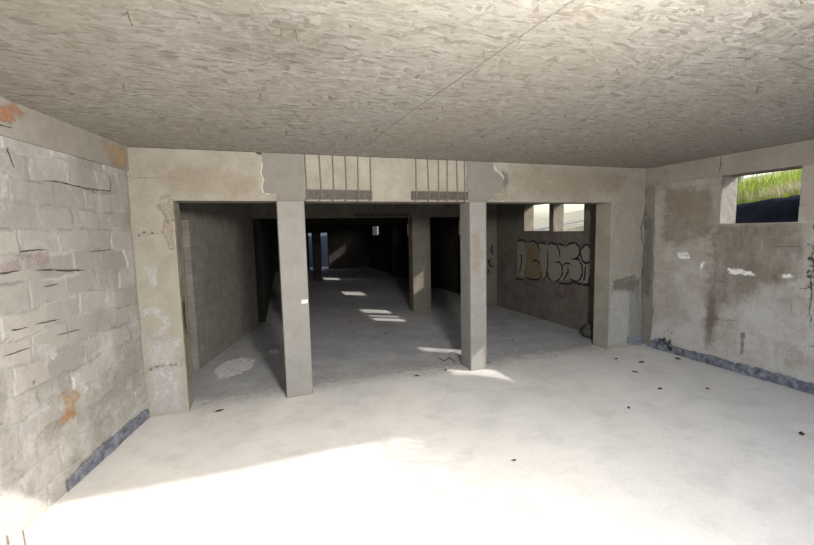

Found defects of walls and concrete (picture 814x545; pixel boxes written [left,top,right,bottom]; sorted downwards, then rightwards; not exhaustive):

crack [241,0,575,159]
crack [3,319,80,357]
crack [0,249,110,287]
crack [46,175,188,403]
spalling [157,195,174,250]
crack [636,139,811,308]
crack [776,225,814,323]